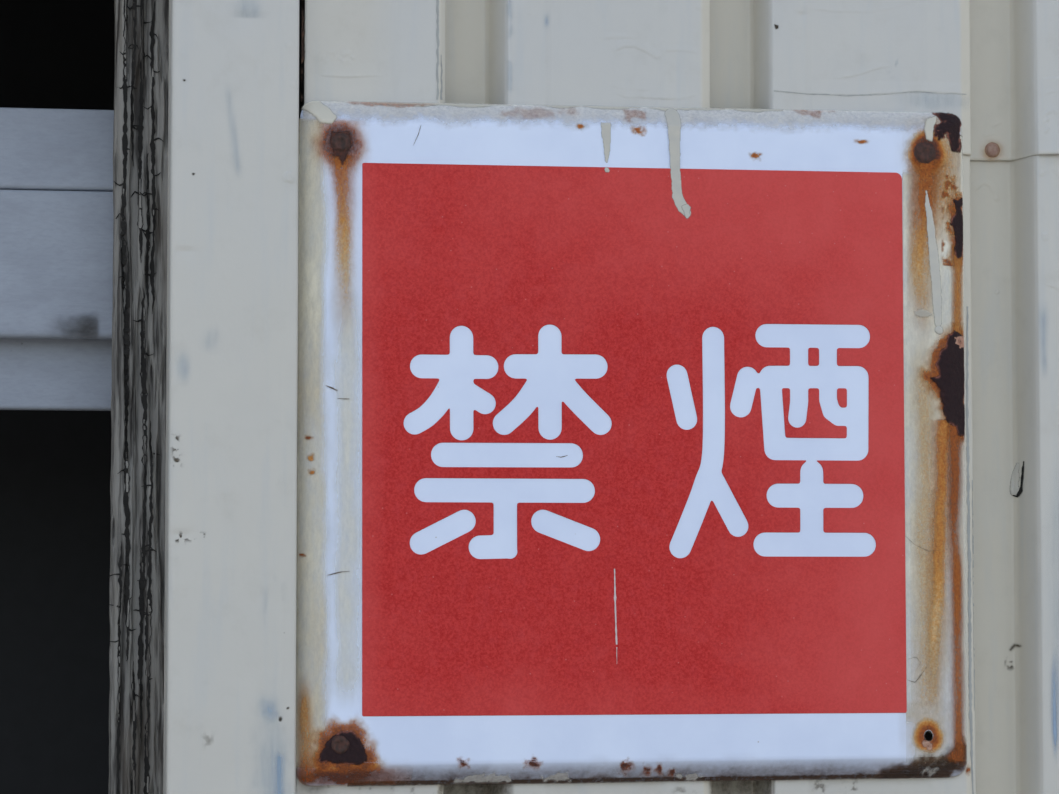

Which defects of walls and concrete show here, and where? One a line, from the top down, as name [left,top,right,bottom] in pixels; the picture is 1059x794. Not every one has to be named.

rust [318,121,363,293]
rust [908,130,961,305]
rust [337,311,358,685]
rust [918,380,937,702]
rust [279,696,970,786]